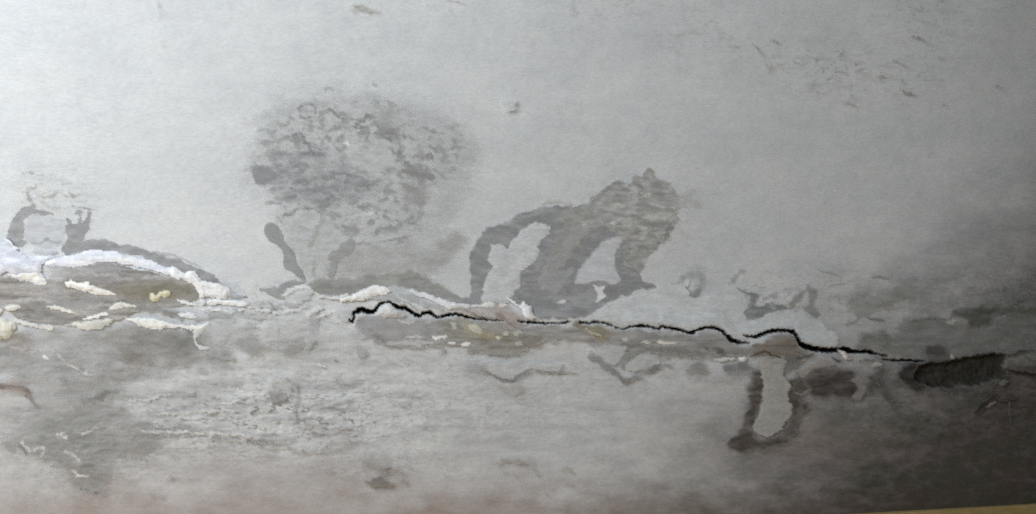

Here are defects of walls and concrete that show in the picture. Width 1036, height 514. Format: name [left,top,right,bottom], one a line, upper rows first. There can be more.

leakage [6,171,247,299]
leakage [251,84,699,319]
flaking render [0,238,850,371]
crack [349,301,924,408]
leakage [722,275,915,453]
peeling [890,314,1036,396]
crack [974,349,1036,417]